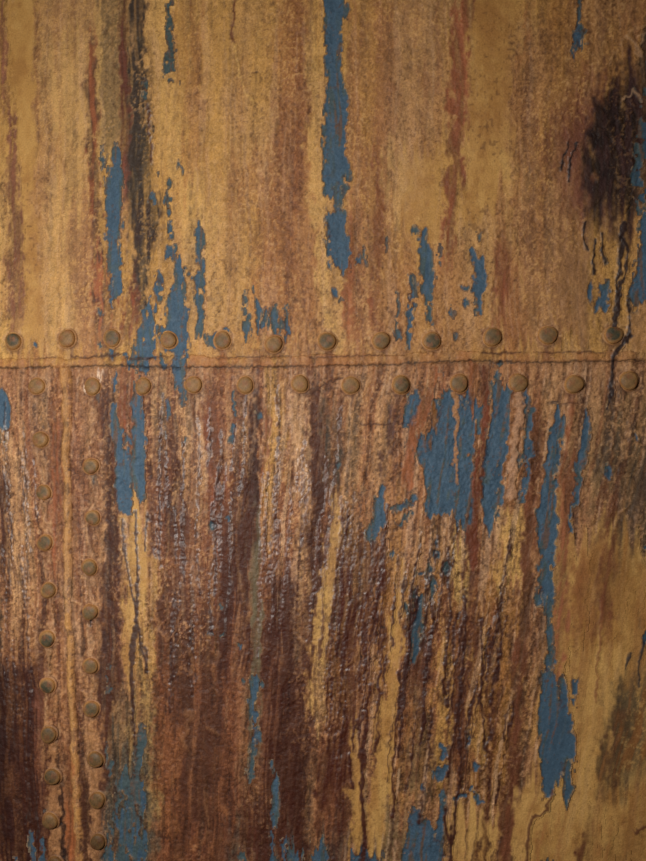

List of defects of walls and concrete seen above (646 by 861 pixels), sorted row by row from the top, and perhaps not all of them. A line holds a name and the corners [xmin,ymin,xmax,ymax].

corrosion [0,369,67,861]
peeling [95,141,292,517]
corrosion [61,0,547,861]
peeling [320,0,369,278]
peeling [391,224,443,350]
peeling [401,742,486,861]
peeling [448,231,489,320]
peeling [365,359,592,811]
corrosion [524,710,623,861]
leakage [542,23,646,568]
corrosion [552,354,646,782]
peeling [626,87,646,307]